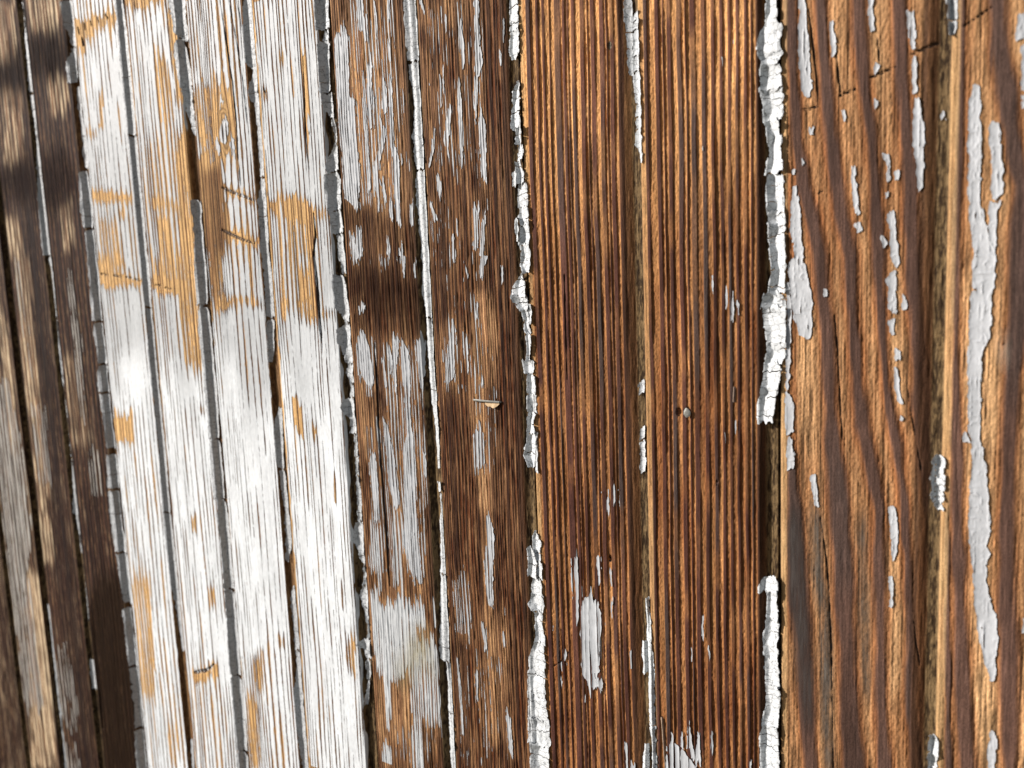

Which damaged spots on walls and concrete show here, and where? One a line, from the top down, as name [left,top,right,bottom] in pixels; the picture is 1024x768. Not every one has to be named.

peeling [499,0,520,66]
peeling [623,0,643,163]
peeling [906,10,925,192]
peeling [501,81,539,473]
peeling [756,0,827,471]
peeling [880,210,907,335]
peeling [22,0,513,768]
peeling [962,84,1004,682]
peeling [526,530,554,768]
peeling [571,548,613,702]
peeling [624,597,713,768]
peeling [749,575,781,768]